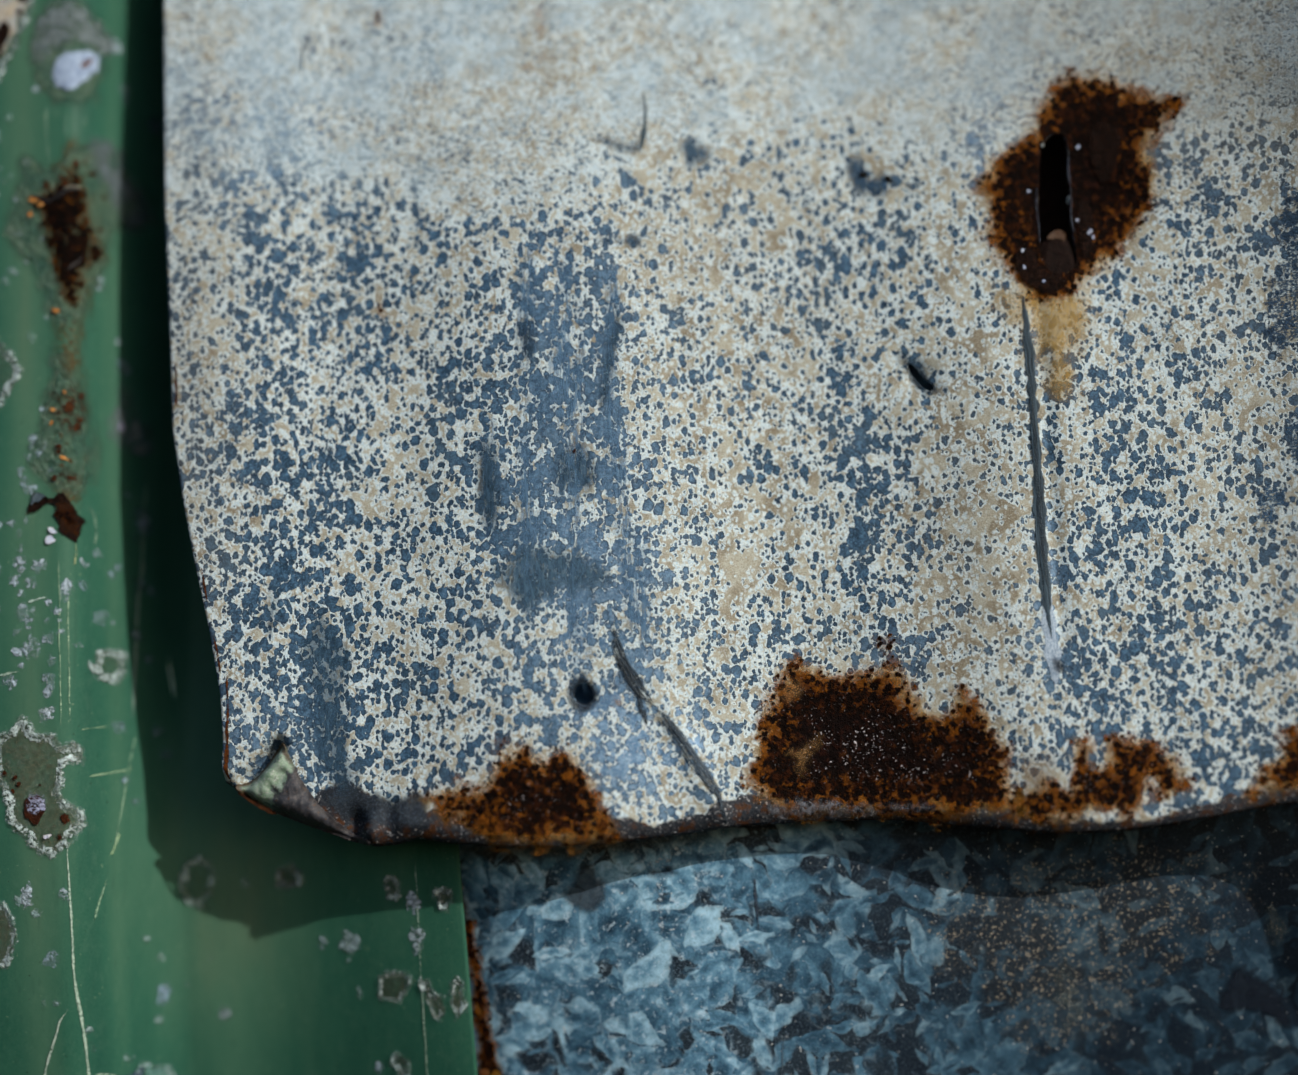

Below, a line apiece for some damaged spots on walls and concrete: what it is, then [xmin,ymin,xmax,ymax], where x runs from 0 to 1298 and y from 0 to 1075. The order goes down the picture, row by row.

peeling [0,0,112,102]
rust [974,65,1193,306]
rust [27,142,106,501]
rust [415,730,620,855]
rust [739,633,1196,833]
rust [1245,724,1298,808]
rust [463,895,503,1075]